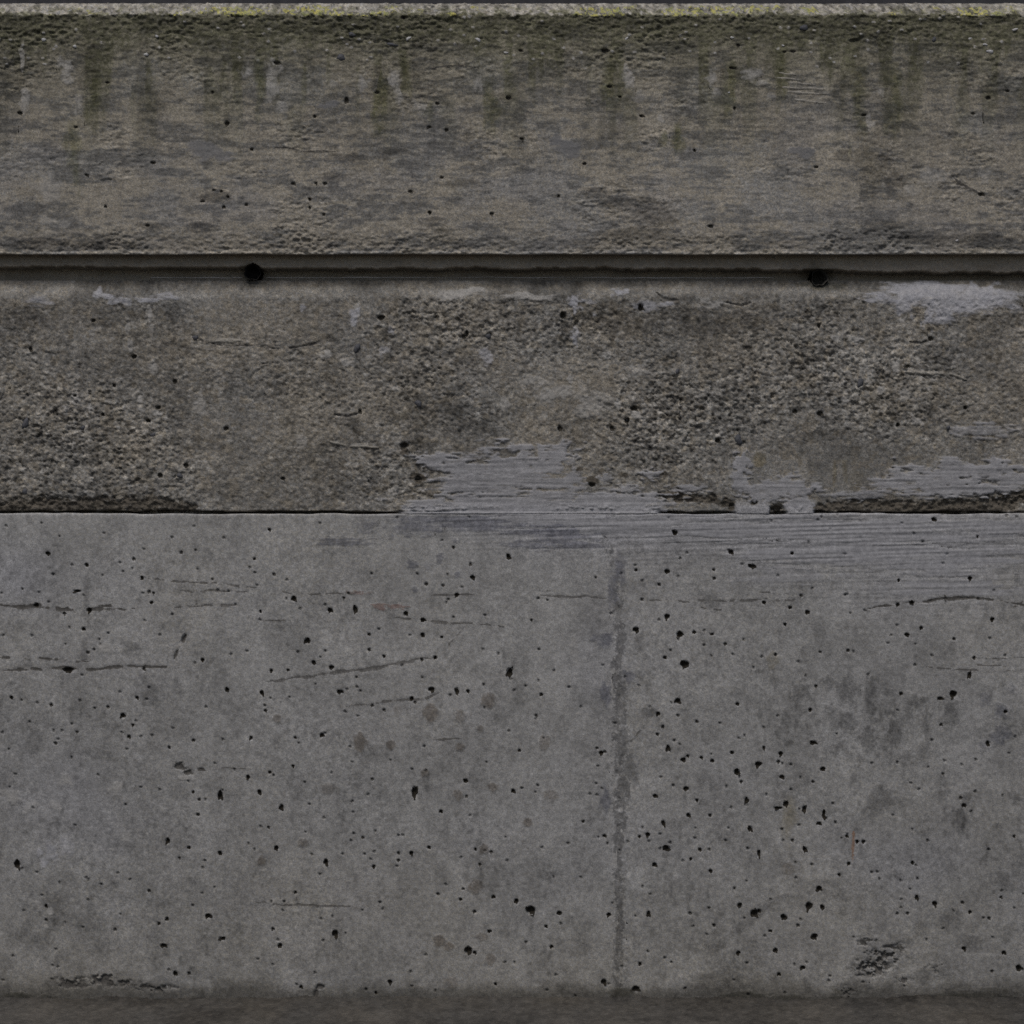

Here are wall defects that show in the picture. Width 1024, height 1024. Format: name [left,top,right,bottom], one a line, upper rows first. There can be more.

water stain [0,32,119,251]
water stain [239,46,294,140]
water stain [312,47,440,184]
water stain [471,72,516,145]
water stain [546,47,688,162]
water stain [701,42,793,132]
water stain [826,53,1024,248]
water stain [132,220,221,234]
water stain [573,185,690,244]
spalling [384,471,442,497]
spalling [575,465,630,488]
spalling [811,490,1024,514]